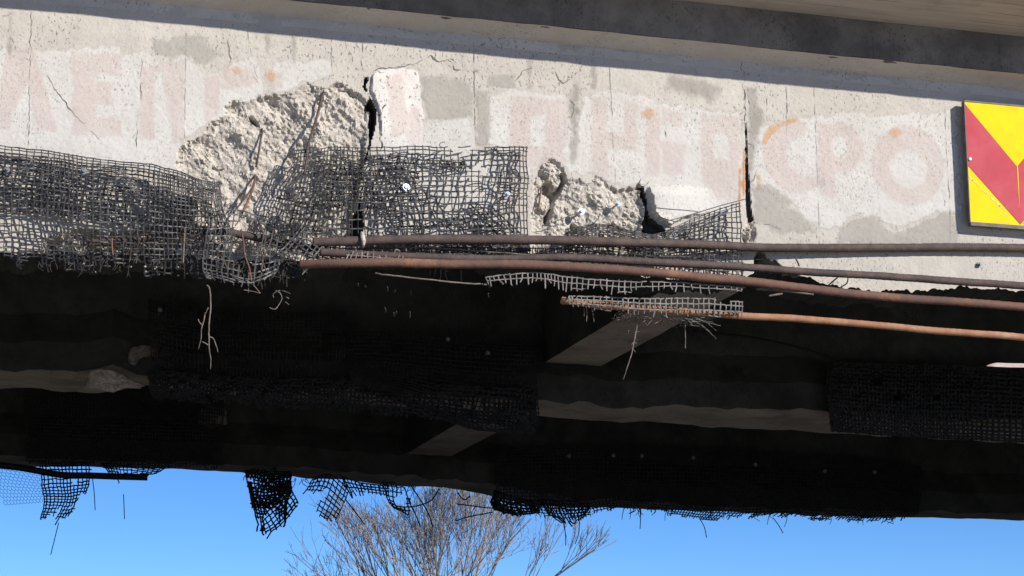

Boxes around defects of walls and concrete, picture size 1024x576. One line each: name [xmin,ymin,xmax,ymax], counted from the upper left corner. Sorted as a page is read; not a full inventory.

crack [350,39,480,236]
peeling [0,45,962,278]
crack [739,62,788,230]